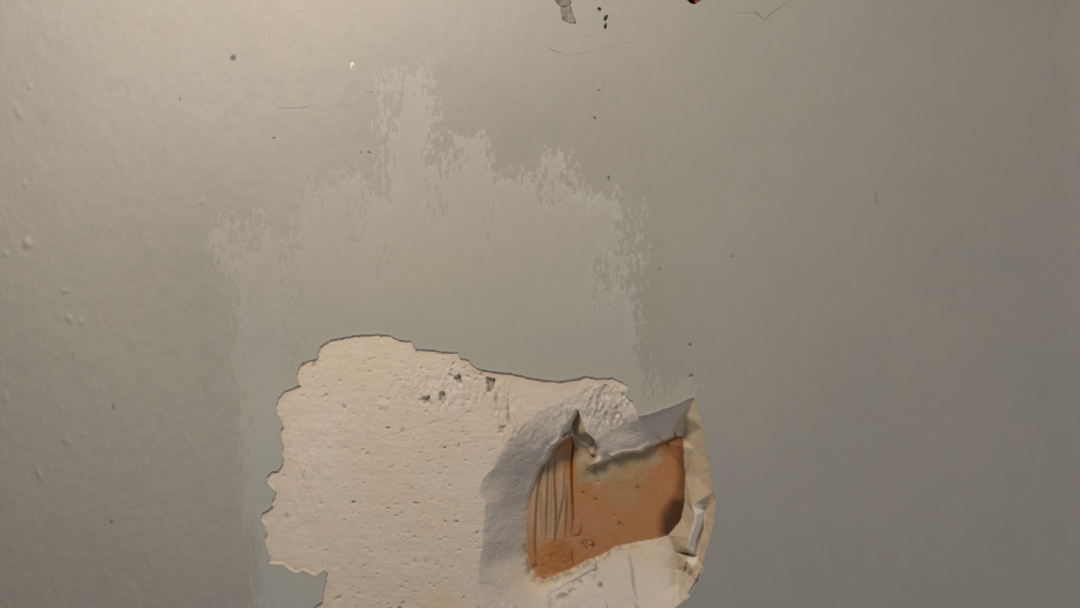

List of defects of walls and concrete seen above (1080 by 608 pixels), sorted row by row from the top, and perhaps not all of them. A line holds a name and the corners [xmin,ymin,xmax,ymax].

flaking render [261,335,716,608]